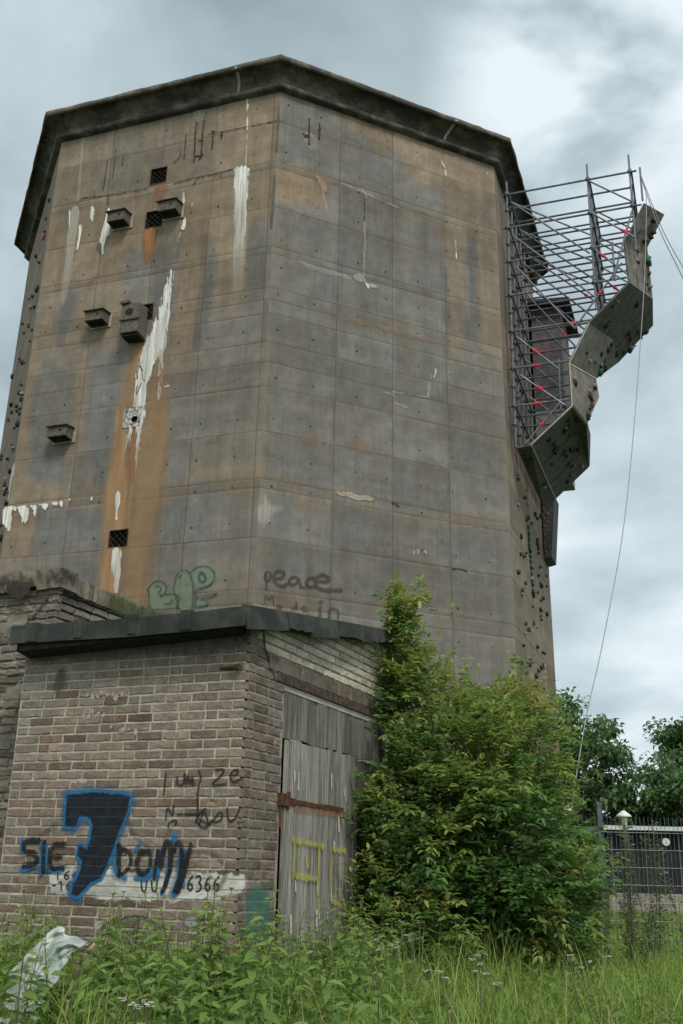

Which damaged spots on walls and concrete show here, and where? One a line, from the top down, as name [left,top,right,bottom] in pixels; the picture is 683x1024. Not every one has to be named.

water stain [234,152,250,233]
rust [142,228,156,261]
water stain [128,269,174,443]
rust [99,341,146,594]
water stain [2,499,70,531]
water stain [111,547,122,579]